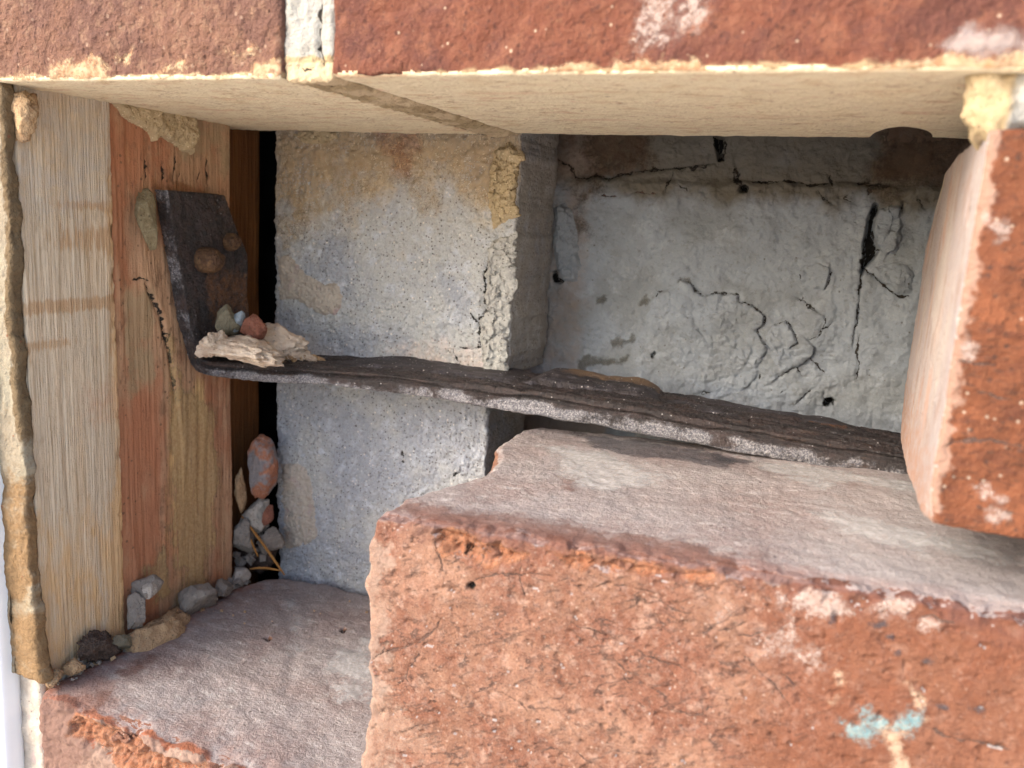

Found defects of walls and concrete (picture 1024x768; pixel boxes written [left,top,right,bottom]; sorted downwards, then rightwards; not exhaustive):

crack [558,141,922,211]
crack [455,263,488,361]
crack [686,249,909,400]
corrosion [333,356,856,427]